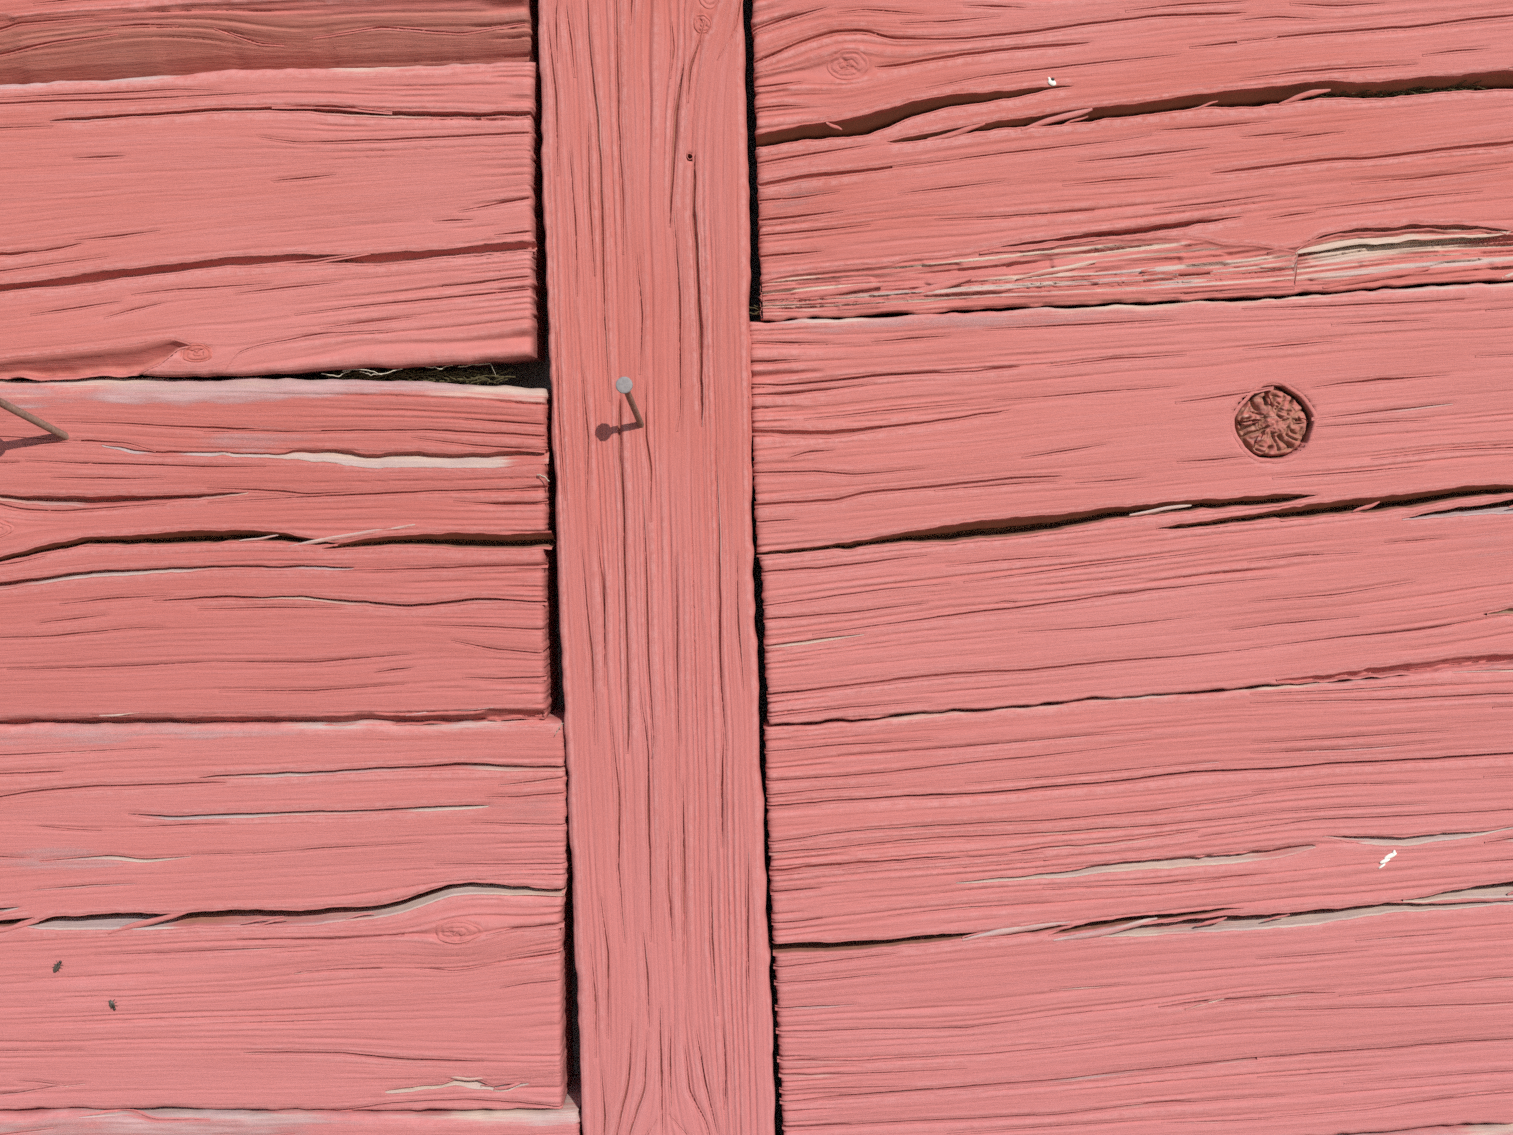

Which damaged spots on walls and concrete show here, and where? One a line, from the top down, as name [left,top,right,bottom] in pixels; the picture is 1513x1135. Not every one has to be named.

crack [0,0,728,1135]
crack [668,0,1513,431]
crack [715,340,1513,1135]